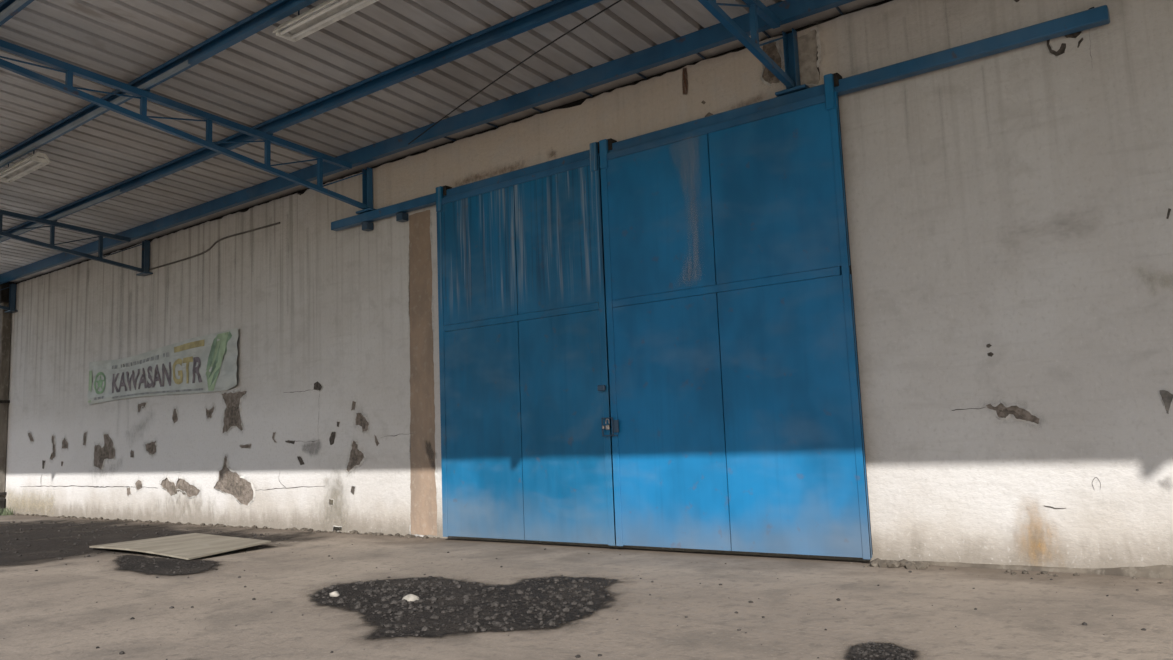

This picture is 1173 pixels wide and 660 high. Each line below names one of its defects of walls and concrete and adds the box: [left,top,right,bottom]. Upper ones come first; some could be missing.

flaking render [206,390,252,449]
flaking render [986,400,1039,426]
flaking render [1158,389,1173,414]
flaking render [42,434,68,469]
flaking render [83,431,116,472]
flaking render [130,440,157,458]
flaking render [272,432,304,465]
flaking render [345,400,380,495]
flaking render [126,479,143,497]
flaking render [160,454,256,506]